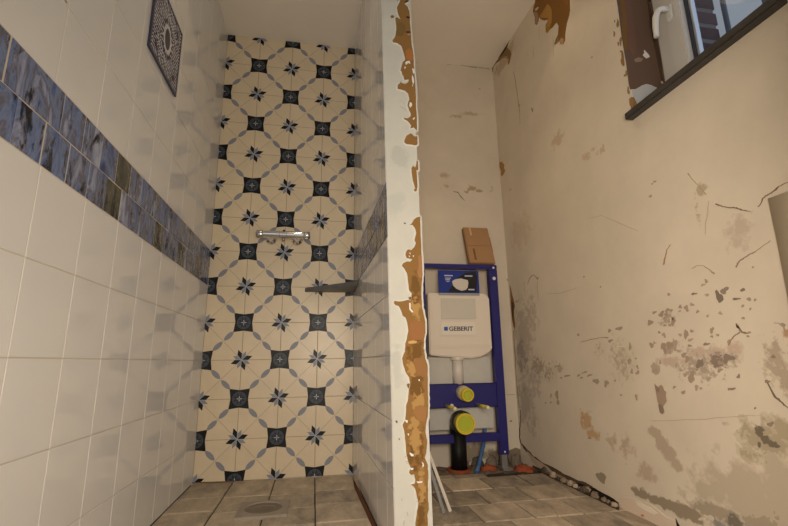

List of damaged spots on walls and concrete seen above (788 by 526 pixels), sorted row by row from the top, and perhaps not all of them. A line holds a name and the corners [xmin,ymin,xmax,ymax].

flaking render [390,0,419,147]
flaking render [533,0,571,46]
flaking render [613,0,665,109]
flaking render [410,160,420,193]
flaking render [392,215,431,526]
leakage [510,275,639,443]
leakage [648,279,788,414]
leakage [605,407,788,526]